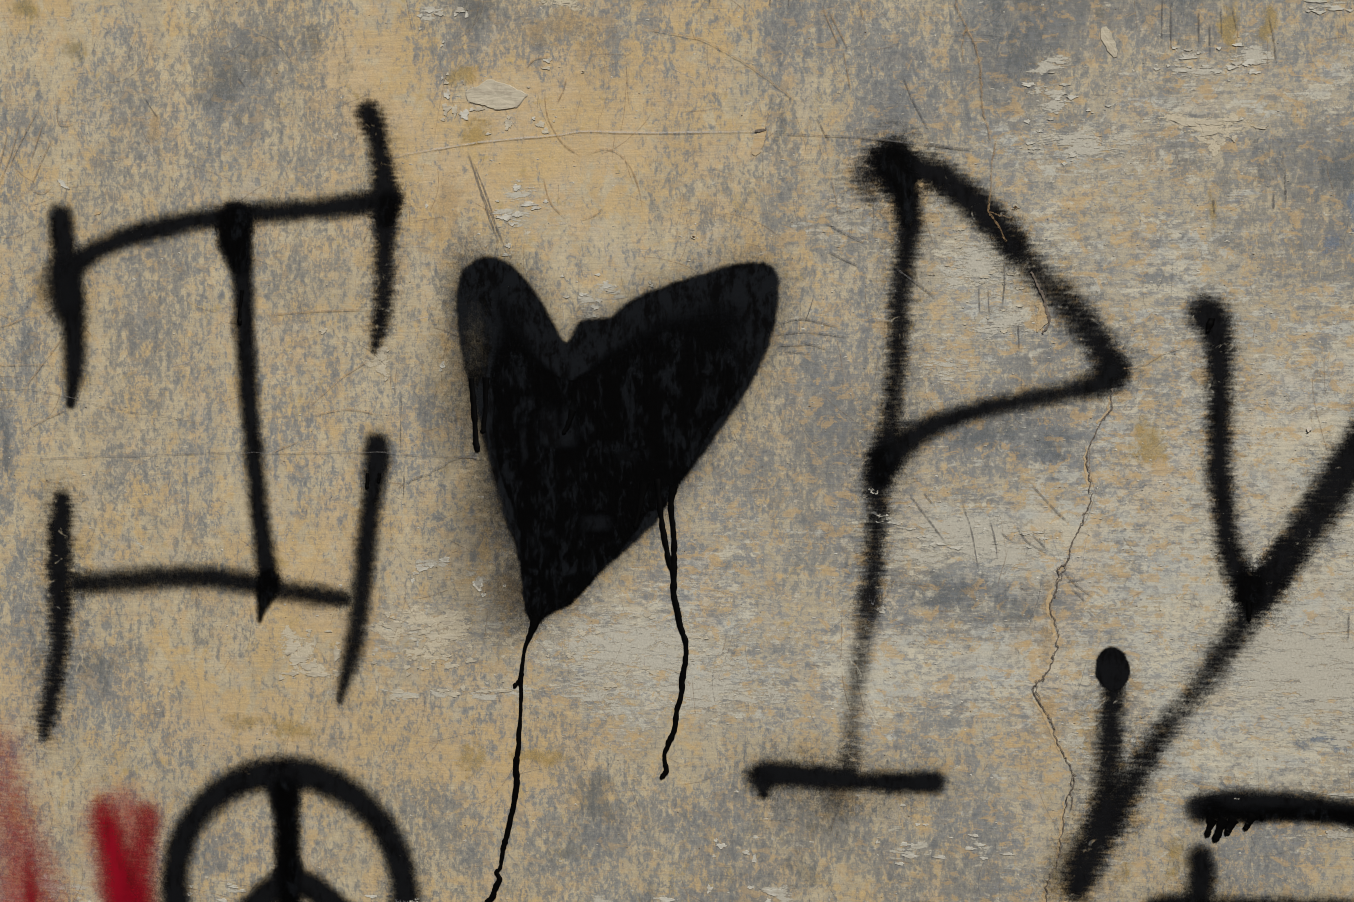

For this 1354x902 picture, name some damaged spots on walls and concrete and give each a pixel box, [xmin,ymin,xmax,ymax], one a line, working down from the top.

flaking render [441,72,531,135]
flaking render [492,180,548,256]
flaking render [408,556,506,597]
flaking render [273,625,342,681]
crack [1032,346,1183,902]